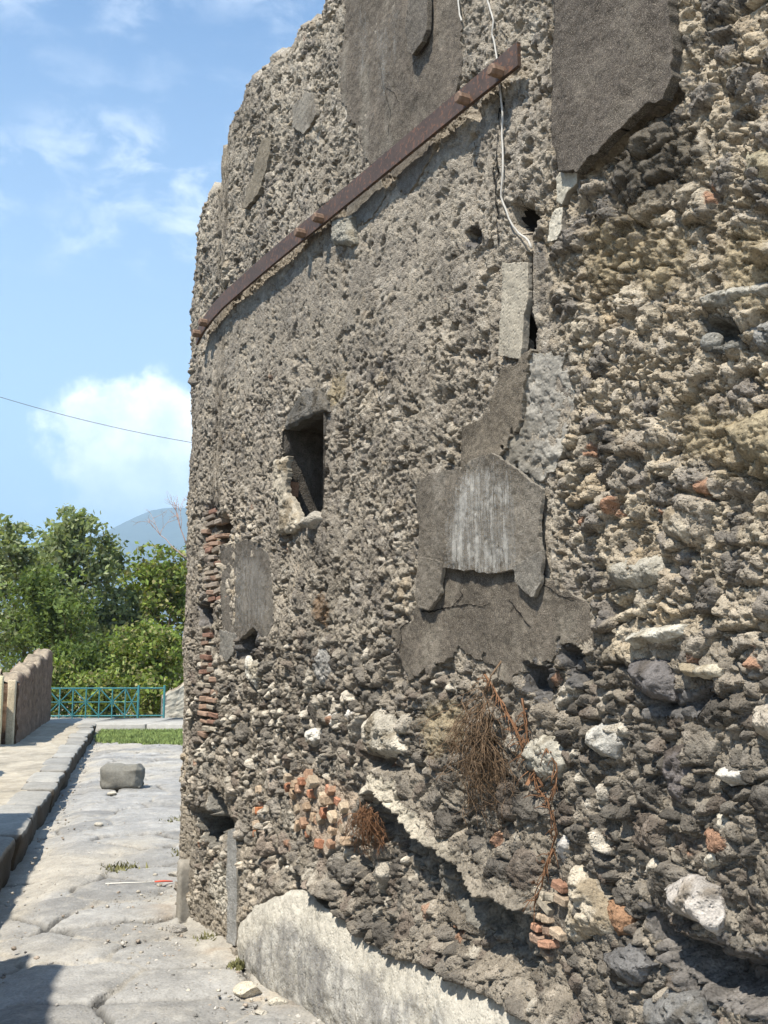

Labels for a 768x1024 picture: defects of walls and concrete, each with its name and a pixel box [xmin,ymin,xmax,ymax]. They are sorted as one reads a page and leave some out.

crack [492,93,540,349]
spalling [699,314,750,358]
crack [393,590,530,660]
spalling [637,680,716,719]
flaking render [283,769,354,849]
flaking render [195,783,530,1024]
spalling [368,802,569,969]
spalling [637,902,768,1021]